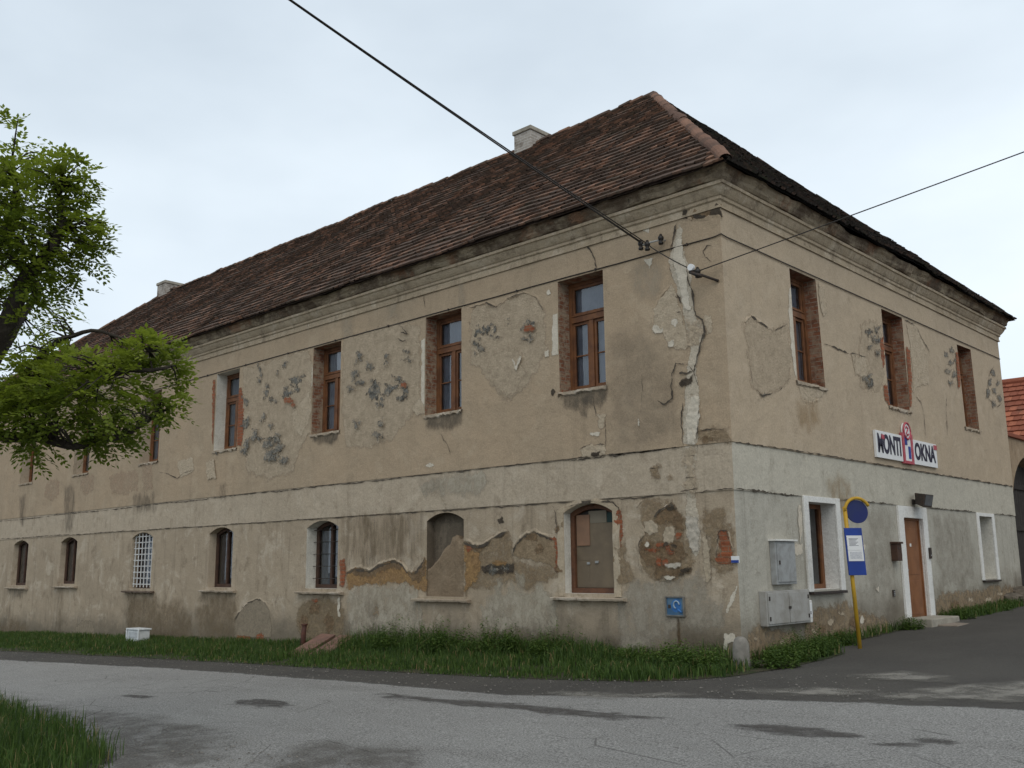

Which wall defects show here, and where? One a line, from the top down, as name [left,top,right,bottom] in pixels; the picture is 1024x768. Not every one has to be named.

spalling [206,380,217,479]
spalling [237,350,313,481]
spalling [342,323,425,449]
crack [1,225,799,556]
peeling [468,290,558,401]
peeling [649,282,689,350]
peeling [742,287,823,406]
spalling [859,320,890,405]
spalling [462,498,738,652]